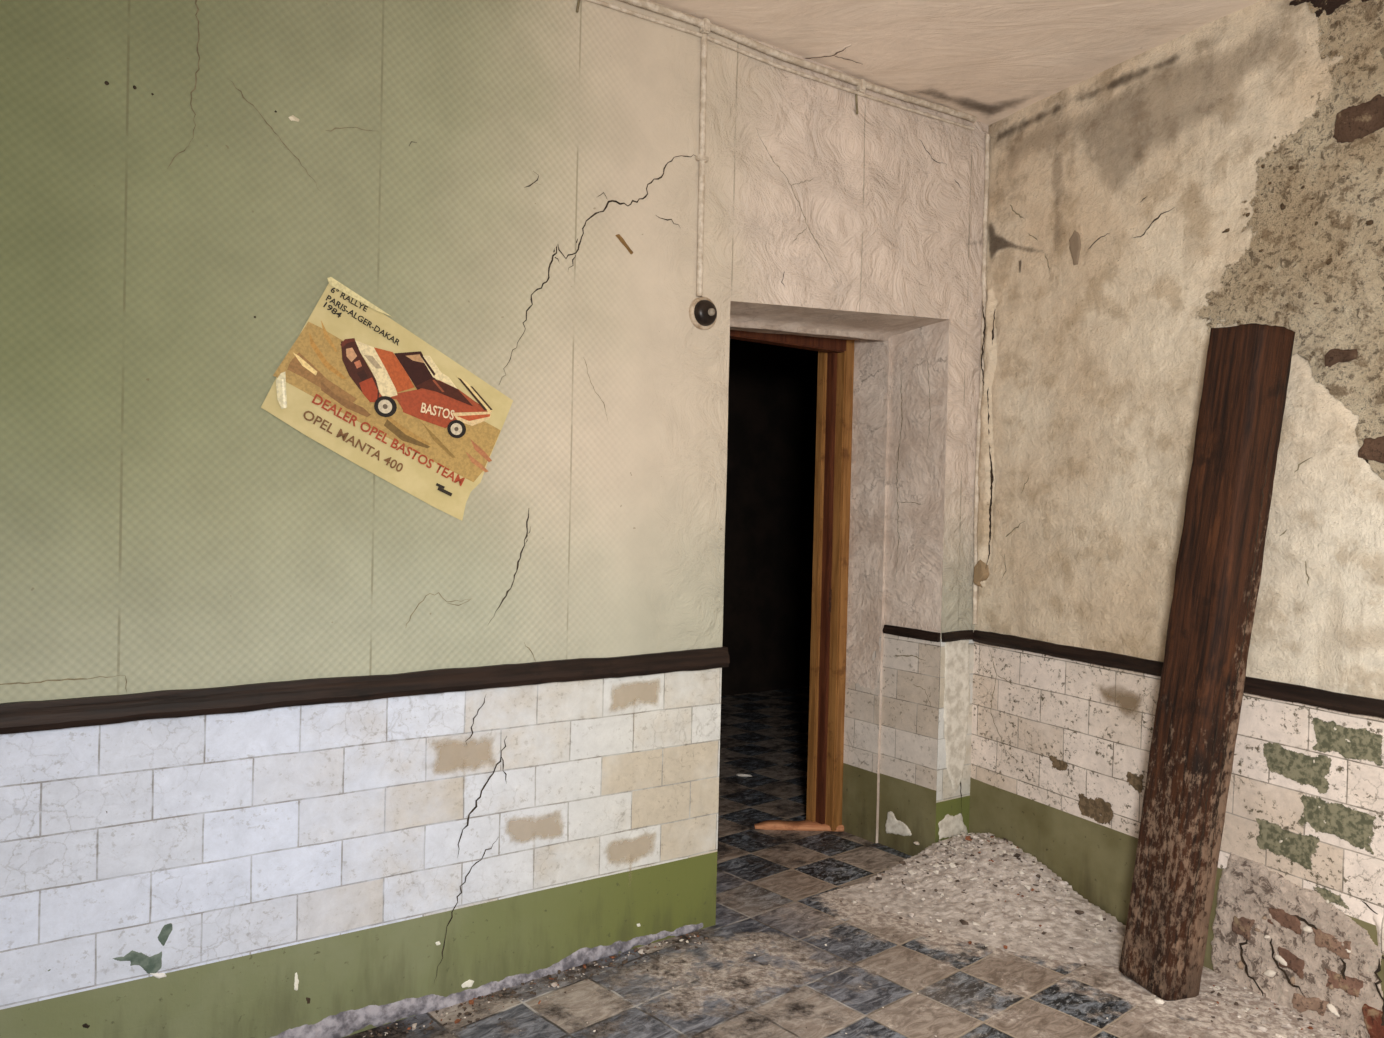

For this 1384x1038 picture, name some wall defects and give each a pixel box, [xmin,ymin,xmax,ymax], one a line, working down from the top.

crack [498,154,696,385]
spalling [1196,0,1384,480]
peeling [113,923,172,978]
crack [434,696,507,981]
spalling [270,923,703,1038]
peeling [885,811,912,836]
peeling [938,814,968,839]
spalling [1211,718,1384,1038]